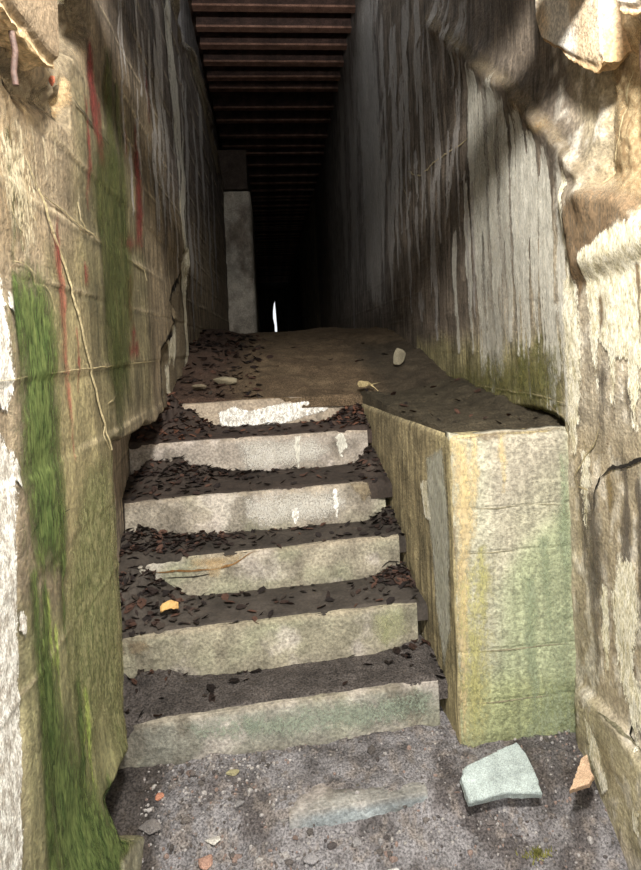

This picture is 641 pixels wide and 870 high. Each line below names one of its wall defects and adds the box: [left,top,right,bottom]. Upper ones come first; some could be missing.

damp [12,271,23,358]
damp [0,128,56,249]
crack [7,160,180,450]
damp [78,44,140,389]
damp [160,0,190,394]
damp [452,62,641,752]
crack [574,426,641,507]